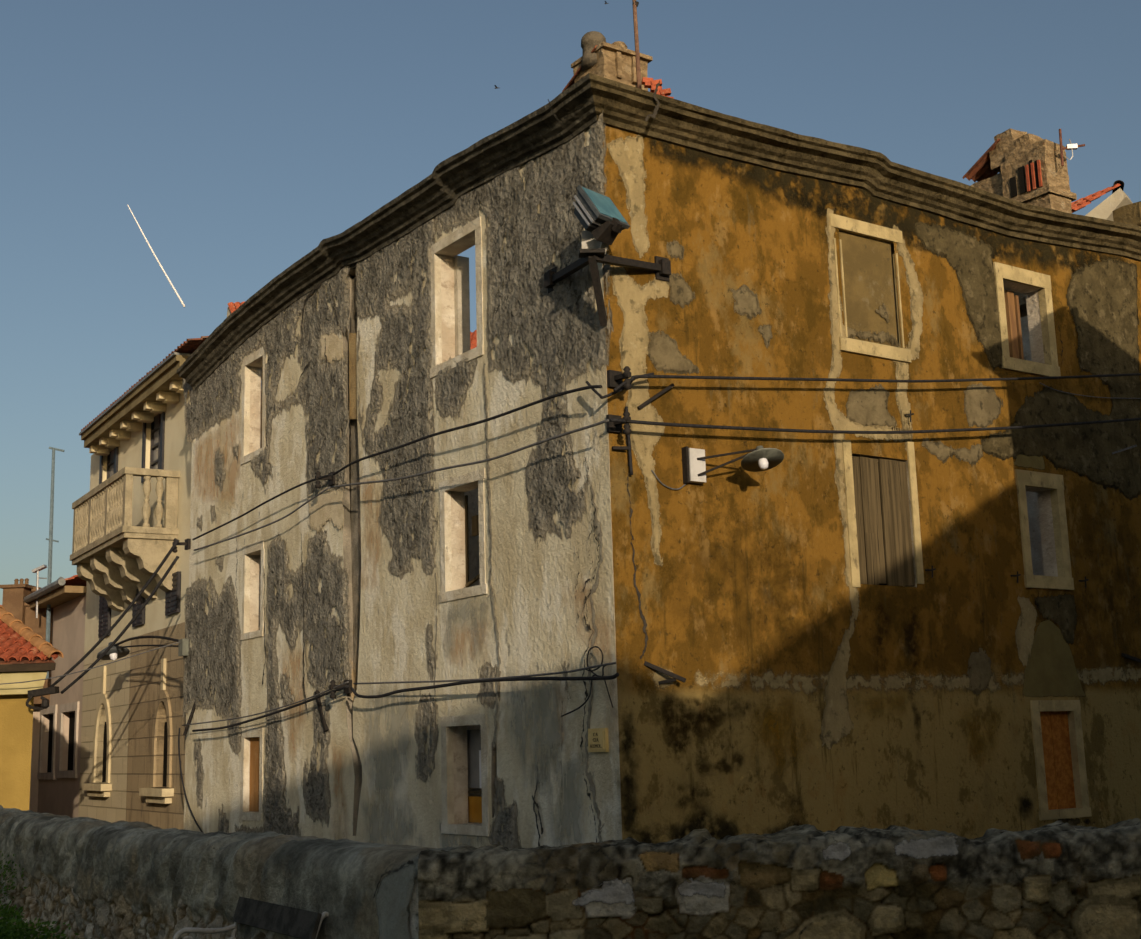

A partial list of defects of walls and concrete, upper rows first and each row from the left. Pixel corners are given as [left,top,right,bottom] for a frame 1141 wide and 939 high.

flaking render [182,111,614,580]
spalling [647,330,699,375]
spalling [846,384,897,427]
spalling [912,221,1002,370]
spalling [922,258,1141,500]
crack [625,435,648,659]
flaking render [193,739,204,809]
flaking render [182,556,242,754]
flaking render [218,529,351,836]
flaking render [414,624,438,782]
crack [532,458,604,846]